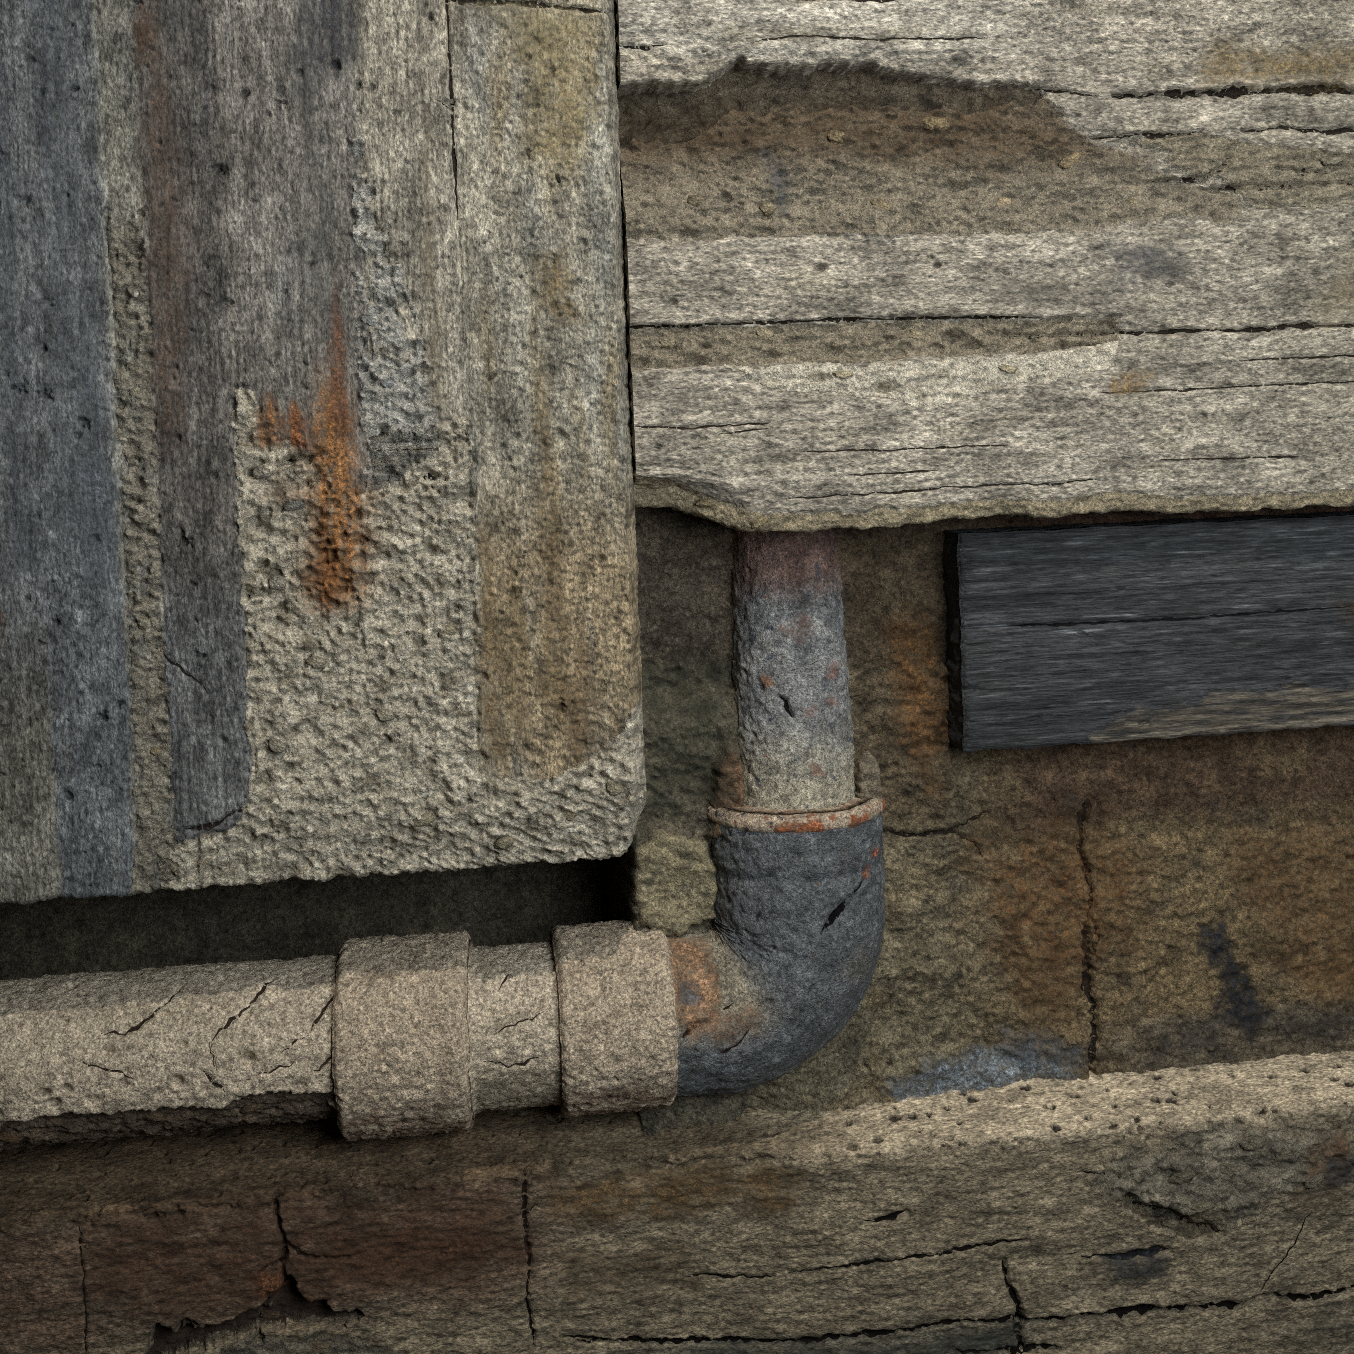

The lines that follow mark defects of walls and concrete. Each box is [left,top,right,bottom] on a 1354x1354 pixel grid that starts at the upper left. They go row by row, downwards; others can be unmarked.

corrosion [258,297,366,609]
crack [1076,802,1100,1070]
crack [79,1226,88,1354]
crack [260,1198,348,1284]
crack [521,1168,1354,1354]